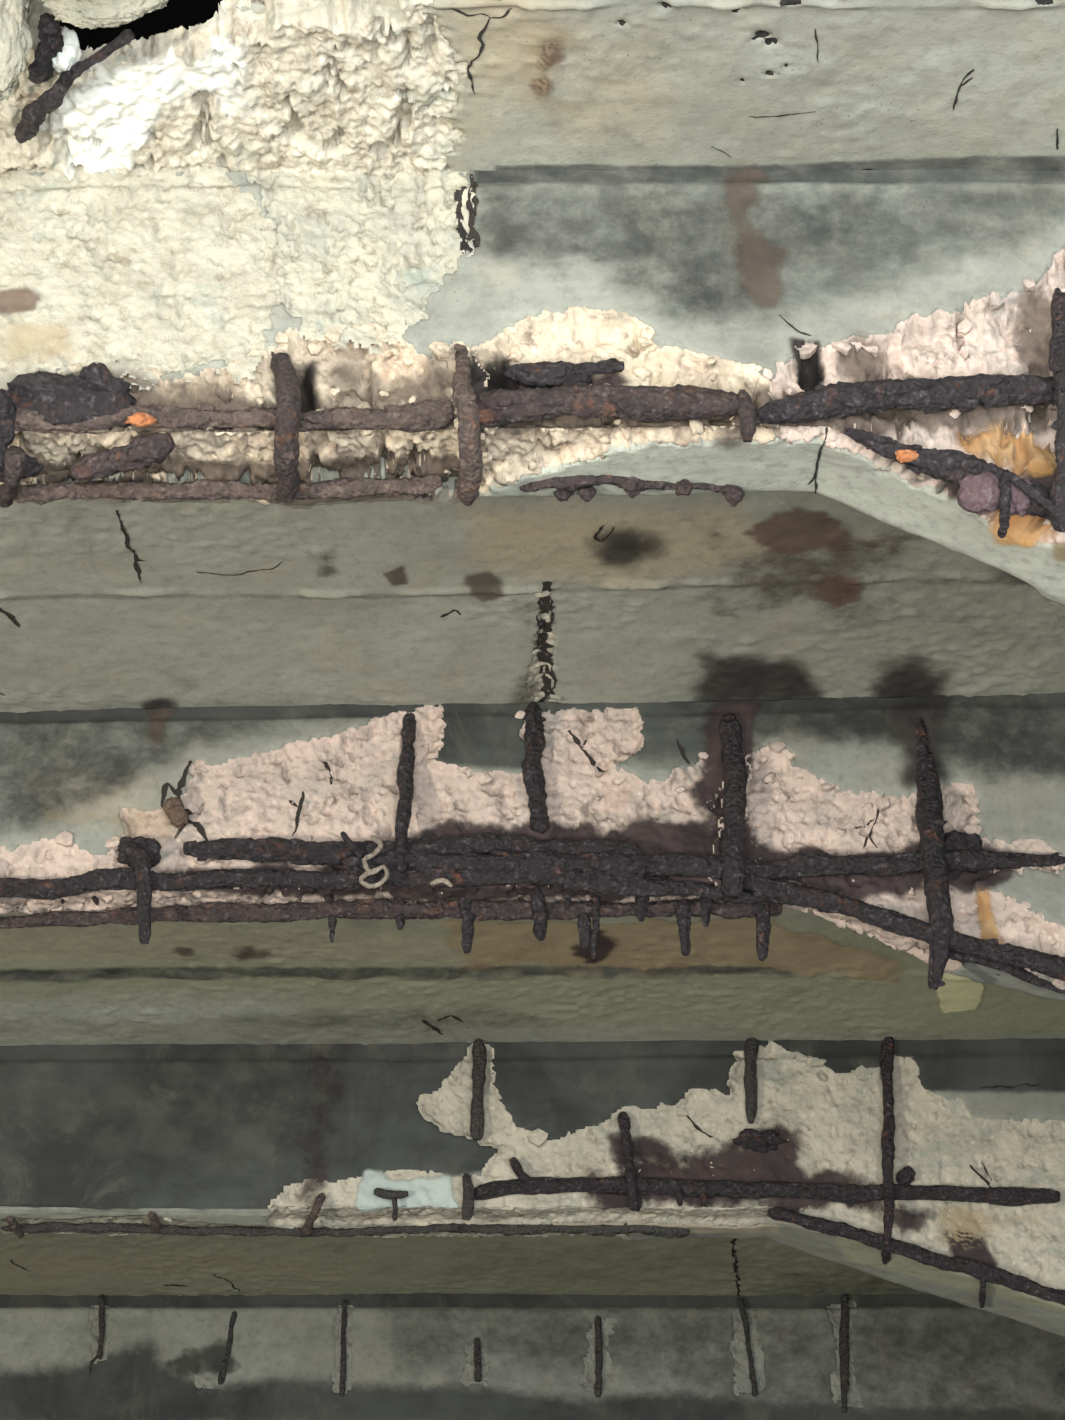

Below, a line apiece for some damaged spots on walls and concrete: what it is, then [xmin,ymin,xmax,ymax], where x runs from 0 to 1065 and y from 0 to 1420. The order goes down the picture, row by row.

crack [425,0,512,94]
corrosion [0,289,39,314]
peeling [0,0,1065,545]
corrosion [502,360,628,390]
corrosion [0,362,460,507]
corrosion [482,386,1057,488]
corrosion [992,509,1052,546]
spalling [0,585,1065,1013]
corrosion [407,656,819,857]
corrosion [772,871,924,900]
spalling [0,1041,1065,1305]
corrosion [588,1125,928,1232]